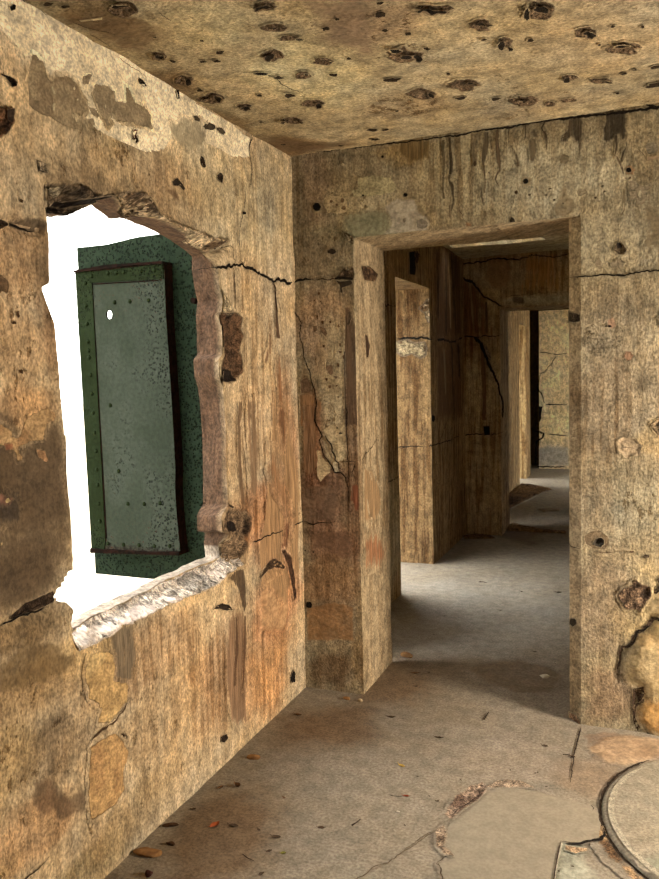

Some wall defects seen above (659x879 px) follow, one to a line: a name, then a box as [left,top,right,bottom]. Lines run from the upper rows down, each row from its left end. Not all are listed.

spalling [570,25,647,56]
spalling [0,103,16,141]
peeling [1,48,154,135]
damp [394,136,455,218]
crack [319,104,659,167]
damp [471,116,585,205]
damp [601,107,632,216]
crack [0,214,47,238]
spalling [219,287,245,388]
crack [199,137,378,542]
damp [0,410,73,627]
crack [0,590,55,626]